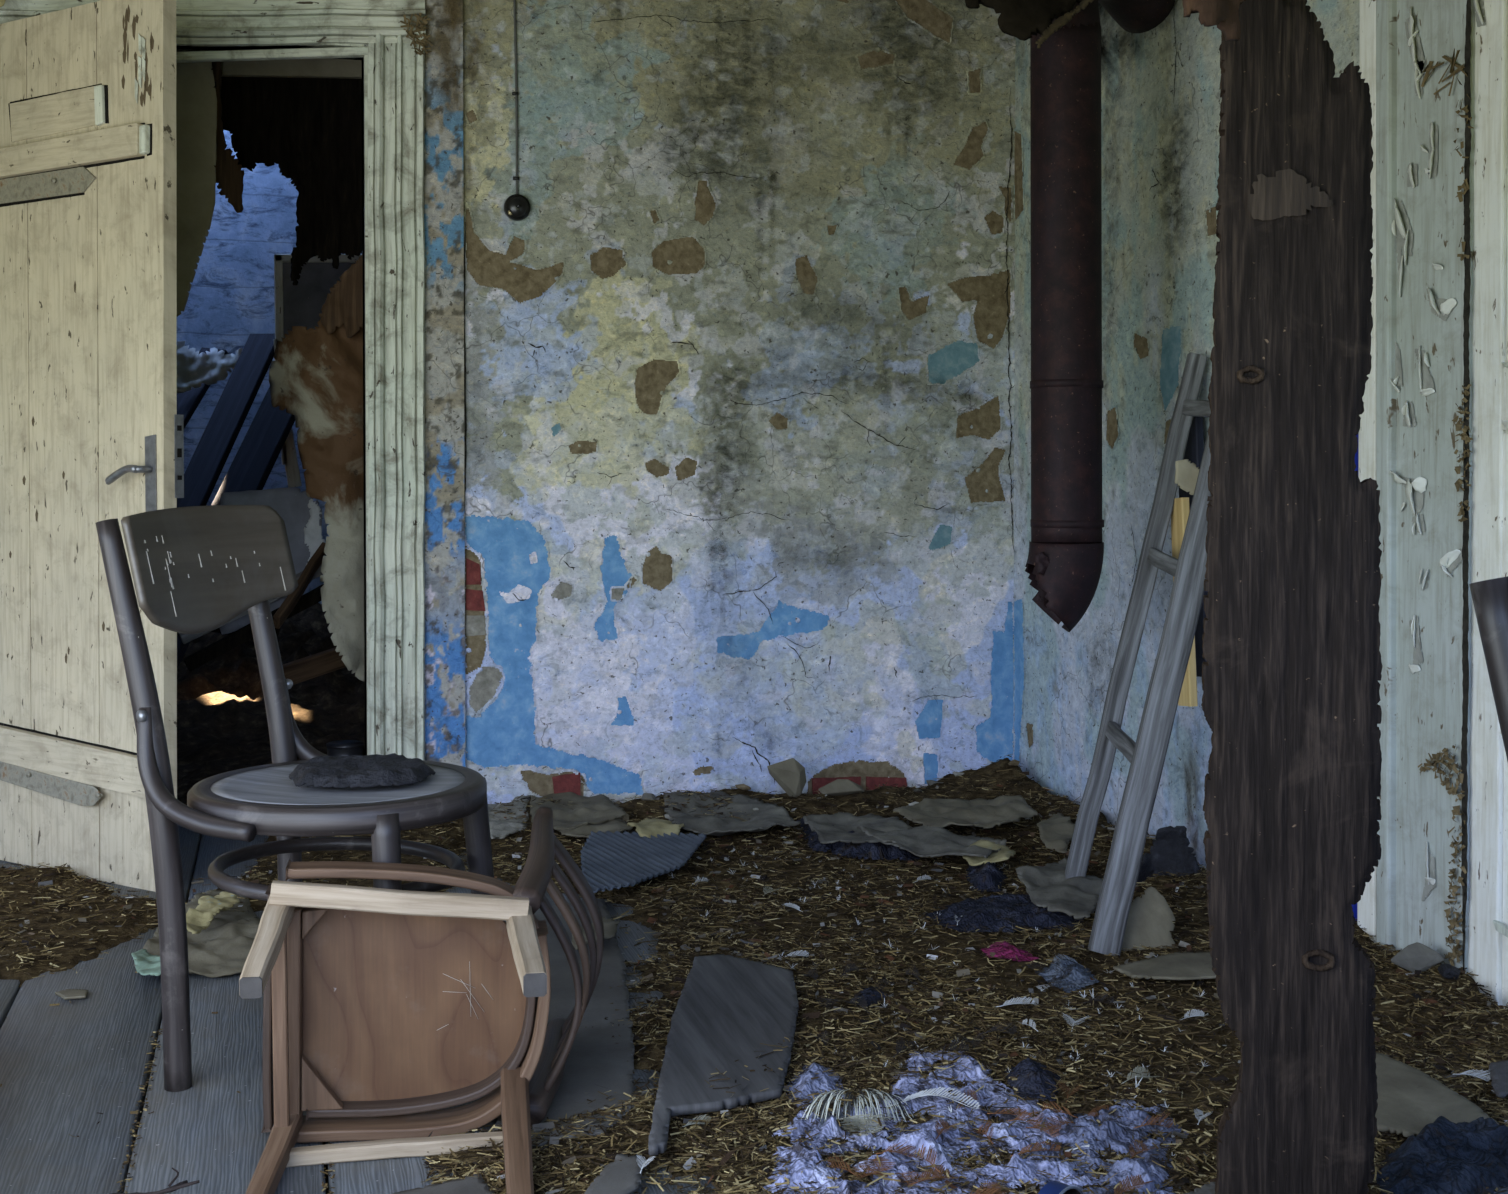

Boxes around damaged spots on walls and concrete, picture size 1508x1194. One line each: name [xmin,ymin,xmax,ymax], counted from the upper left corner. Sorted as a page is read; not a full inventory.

spalling [464,199,565,305]
spalling [588,238,632,281]
spalling [648,178,721,277]
spalling [897,119,1024,385]
peeling [1391,122,1438,297]
spalling [550,419,598,456]
spalling [633,357,691,417]
spalling [954,394,1007,505]
peeling [465,514,645,797]
peeling [589,534,675,647]
peeling [714,595,832,661]
peeling [963,595,1042,766]